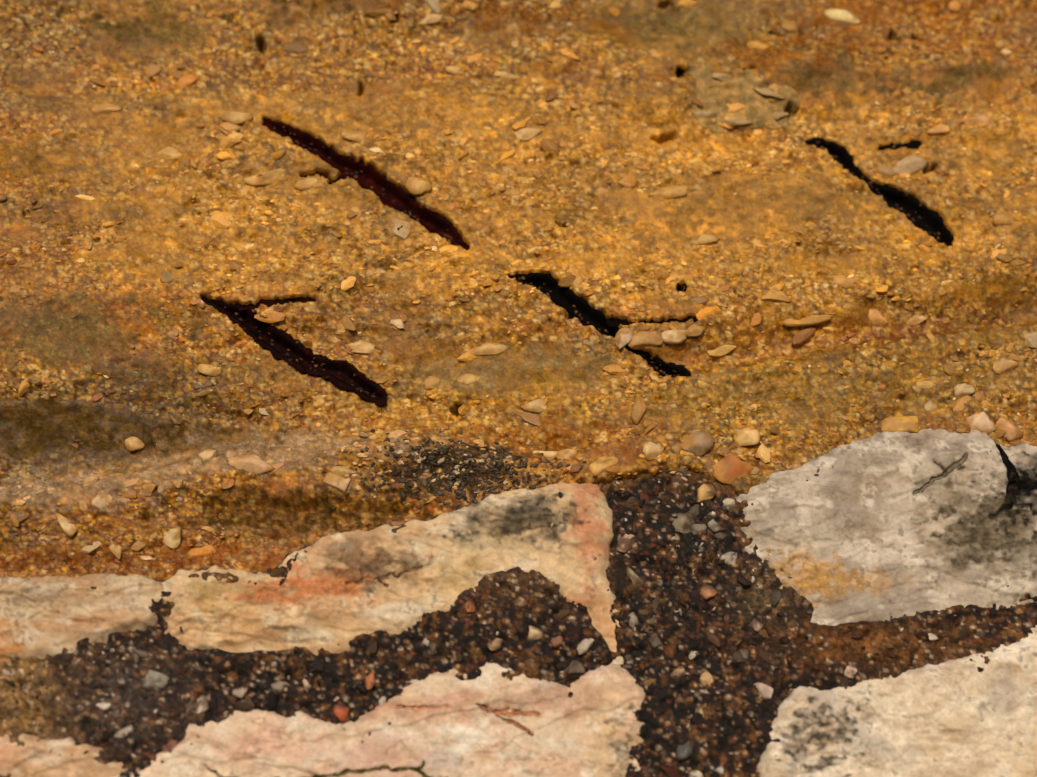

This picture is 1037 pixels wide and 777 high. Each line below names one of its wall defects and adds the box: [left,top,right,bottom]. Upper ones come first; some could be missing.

crack [262,117,470,251]
crack [805,137,954,247]
crack [202,297,388,406]
crack [508,273,698,377]